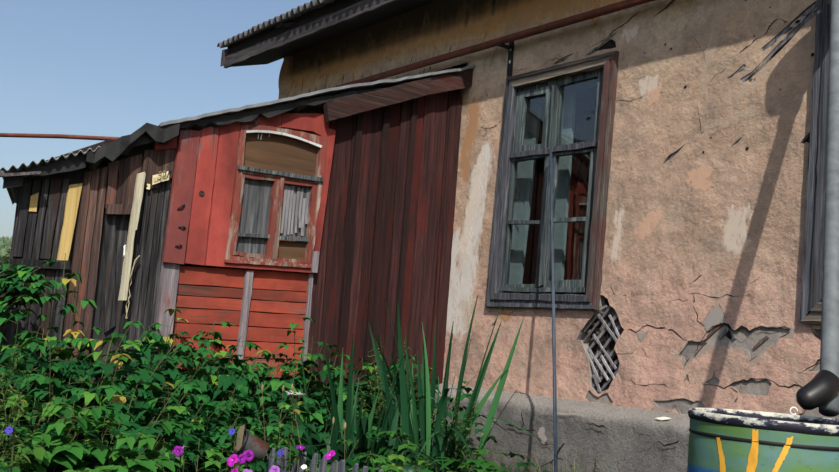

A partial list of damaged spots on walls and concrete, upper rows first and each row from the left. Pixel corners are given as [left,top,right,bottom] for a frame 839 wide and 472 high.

water stain [290,0,599,91]
crack [675,18,787,80]
peeling [446,142,492,341]
peeling [724,205,750,254]
spalling [576,295,624,404]
spalling [674,304,796,384]
spalling [652,398,706,420]
spalling [731,379,772,396]
spalling [800,407,839,419]